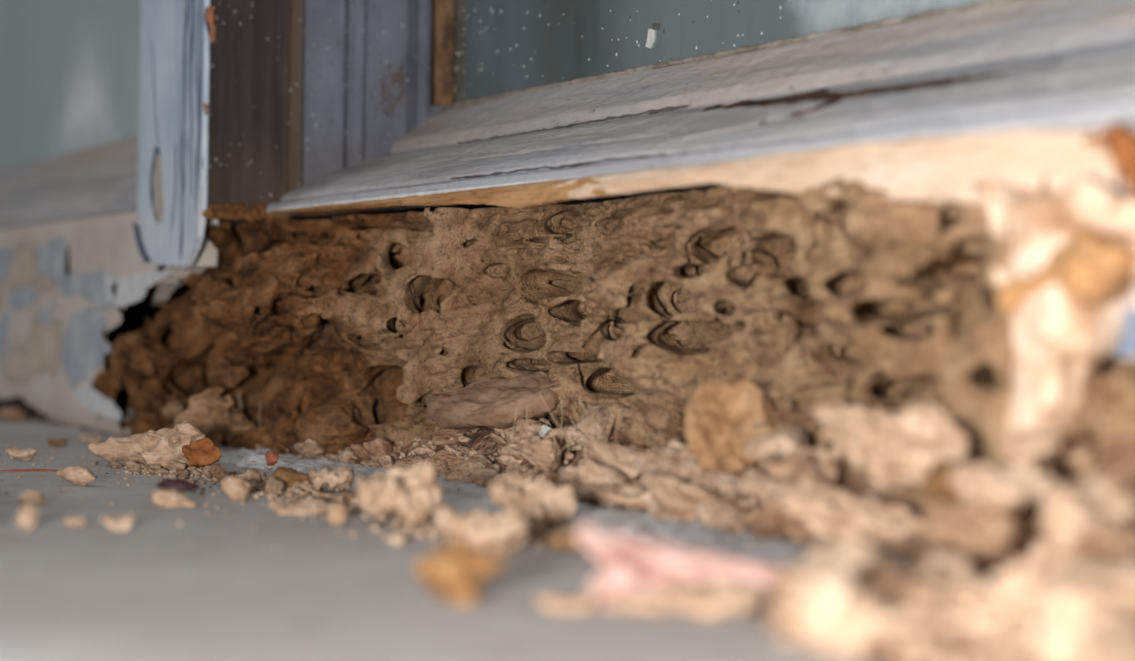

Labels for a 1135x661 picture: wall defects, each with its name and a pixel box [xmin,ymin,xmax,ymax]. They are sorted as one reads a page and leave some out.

crack [449,58,1070,179]
peeling [0,236,178,422]
peeling [1114,307,1135,357]